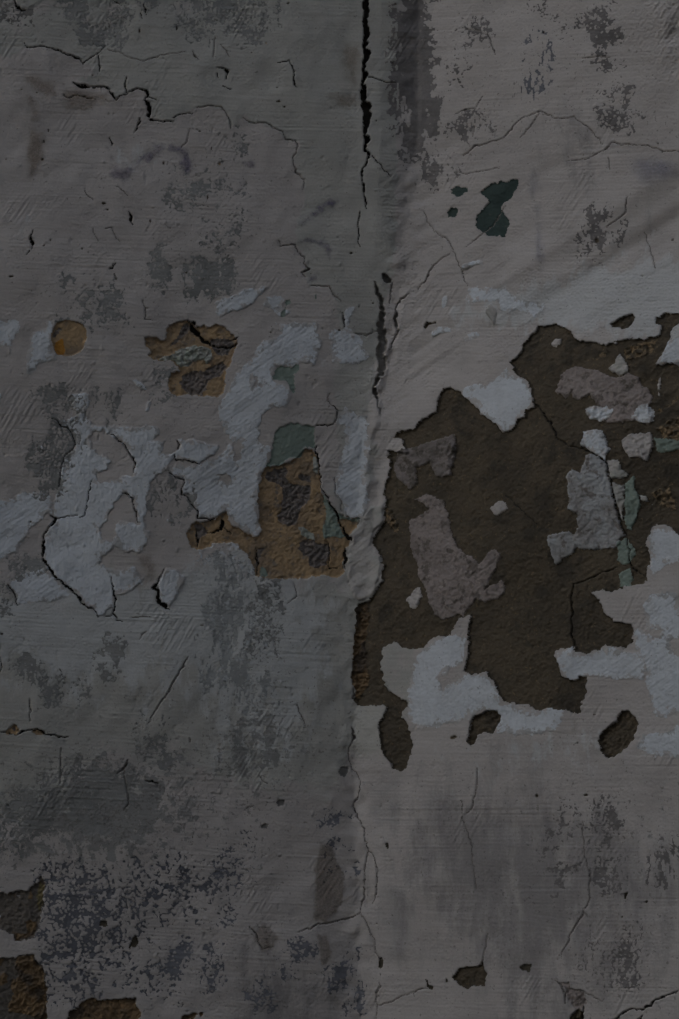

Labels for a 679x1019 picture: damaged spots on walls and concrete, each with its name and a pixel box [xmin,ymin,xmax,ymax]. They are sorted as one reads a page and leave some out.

crack [24,37,305,190]
crack [357,0,396,246]
crack [51,418,76,487]
crack [41,481,170,640]
crack [111,434,138,523]
spalling [0,125,679,772]
peeling [0,849,234,1019]
crack [555,823,677,1019]